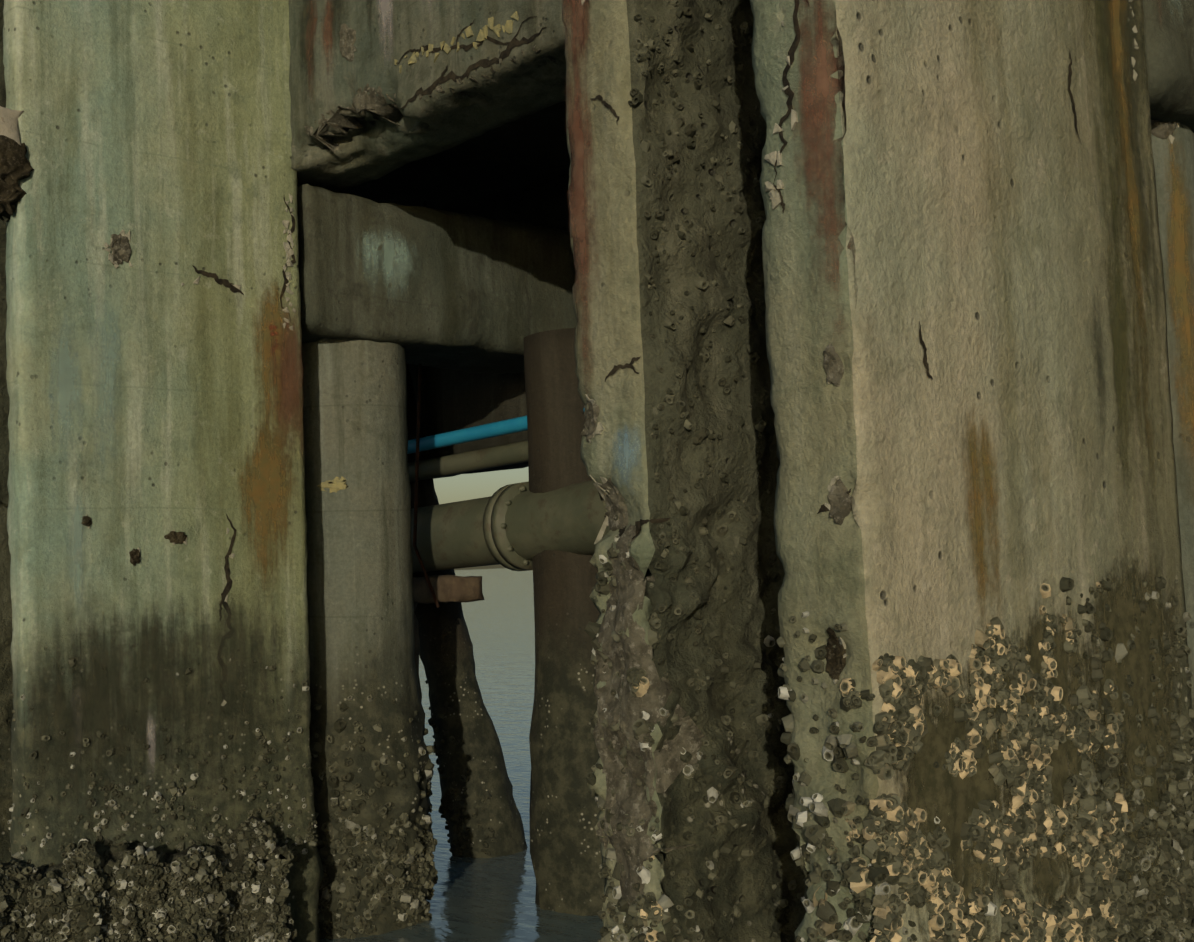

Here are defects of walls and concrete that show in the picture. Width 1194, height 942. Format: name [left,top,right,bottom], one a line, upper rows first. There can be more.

spalling [103,230,132,268]
crack [394,11,582,110]
corrosion [564,0,592,358]
crack [764,0,809,213]
corrosion [800,0,850,277]
spalling [129,548,141,566]
spalling [164,530,187,545]
crack [219,514,237,628]
corrosion [241,288,302,574]
corrosion [968,426,998,599]
damp [35,608,277,793]
spalling [590,475,705,913]